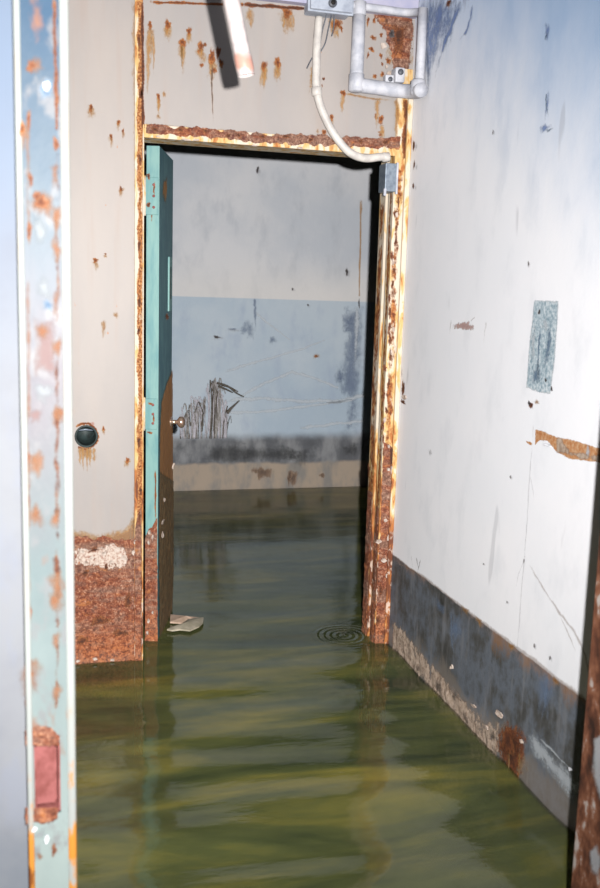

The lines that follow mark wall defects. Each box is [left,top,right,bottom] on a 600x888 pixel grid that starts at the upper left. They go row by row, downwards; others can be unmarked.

rust [19,111,31,150]
rust [28,173,60,256]
rust [74,1,414,700]
rust [28,452,43,474]
rust [54,408,64,449]
peeling [526,430,600,463]
rust [52,460,60,536]
rust [51,555,62,608]
rust [25,726,60,747]
rust [496,721,526,783]
water stain [533,738,575,792]
rust [25,807,58,859]